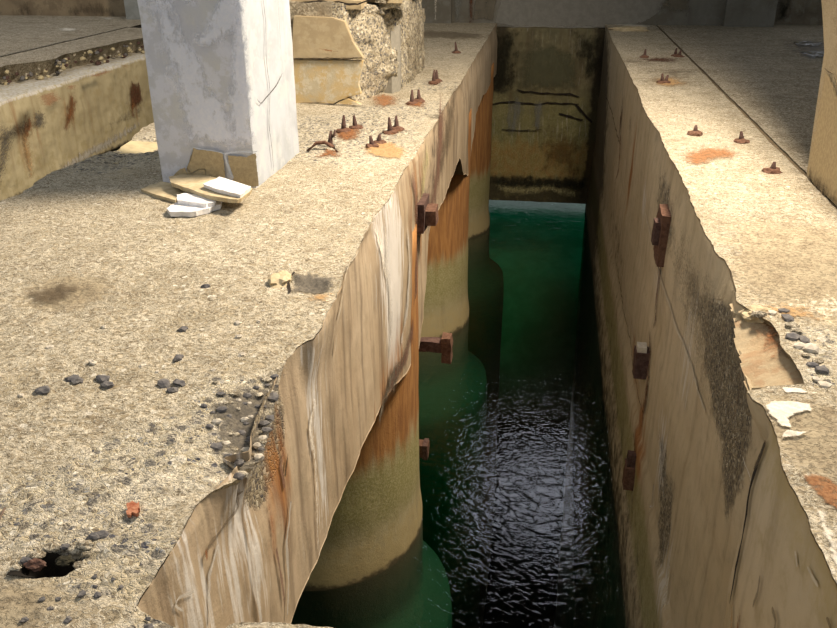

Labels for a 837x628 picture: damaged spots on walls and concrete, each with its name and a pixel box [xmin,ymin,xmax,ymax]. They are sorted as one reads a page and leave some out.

crack [303,0,370,8]
peeling [496,0,665,28]
spalling [2,41,145,85]
crack [293,49,362,59]
rust [130,82,142,116]
crack [313,97,358,106]
crack [492,89,592,123]
rust [337,129,359,140]
rust [367,130,404,158]
spalling [729,303,833,391]
rust [805,474,837,508]
crack [730,440,766,600]